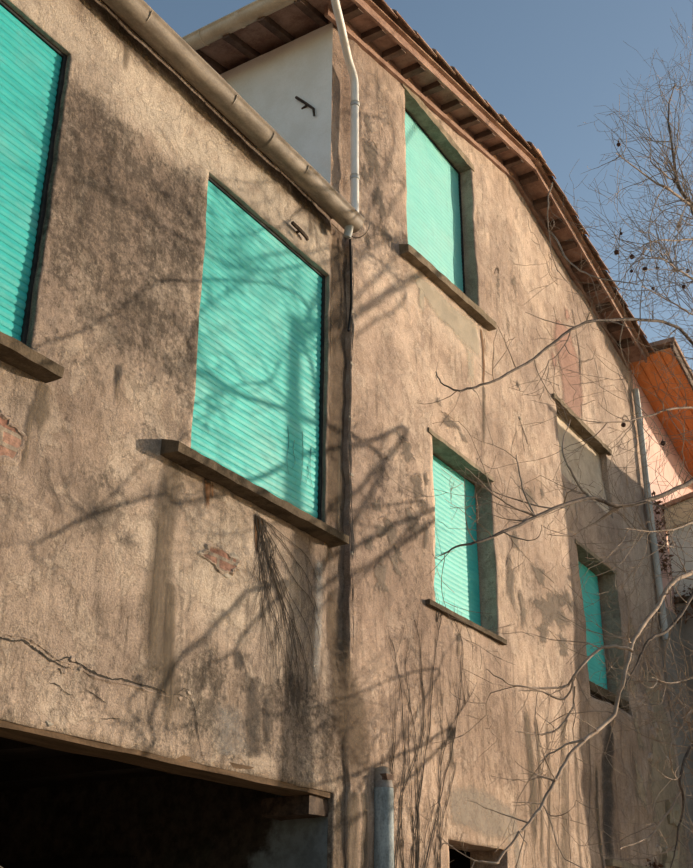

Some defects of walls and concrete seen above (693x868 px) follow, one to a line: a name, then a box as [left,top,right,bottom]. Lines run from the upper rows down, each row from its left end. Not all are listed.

spalling [0,410,30,467]
water stain [149,462,181,709]
spalling [195,543,242,579]
crack [0,632,203,758]
water stain [249,678,270,754]